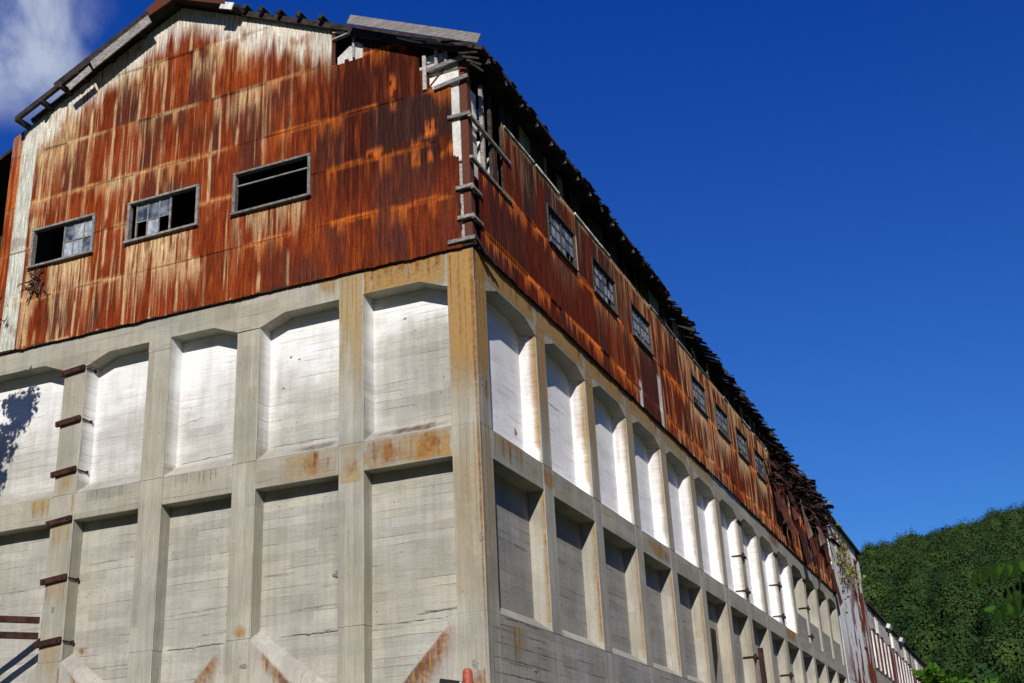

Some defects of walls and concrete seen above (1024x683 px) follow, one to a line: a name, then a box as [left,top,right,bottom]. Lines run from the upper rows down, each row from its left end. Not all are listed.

rust [324,247,632,478]
rust [292,444,366,483]
rust [407,634,446,683]